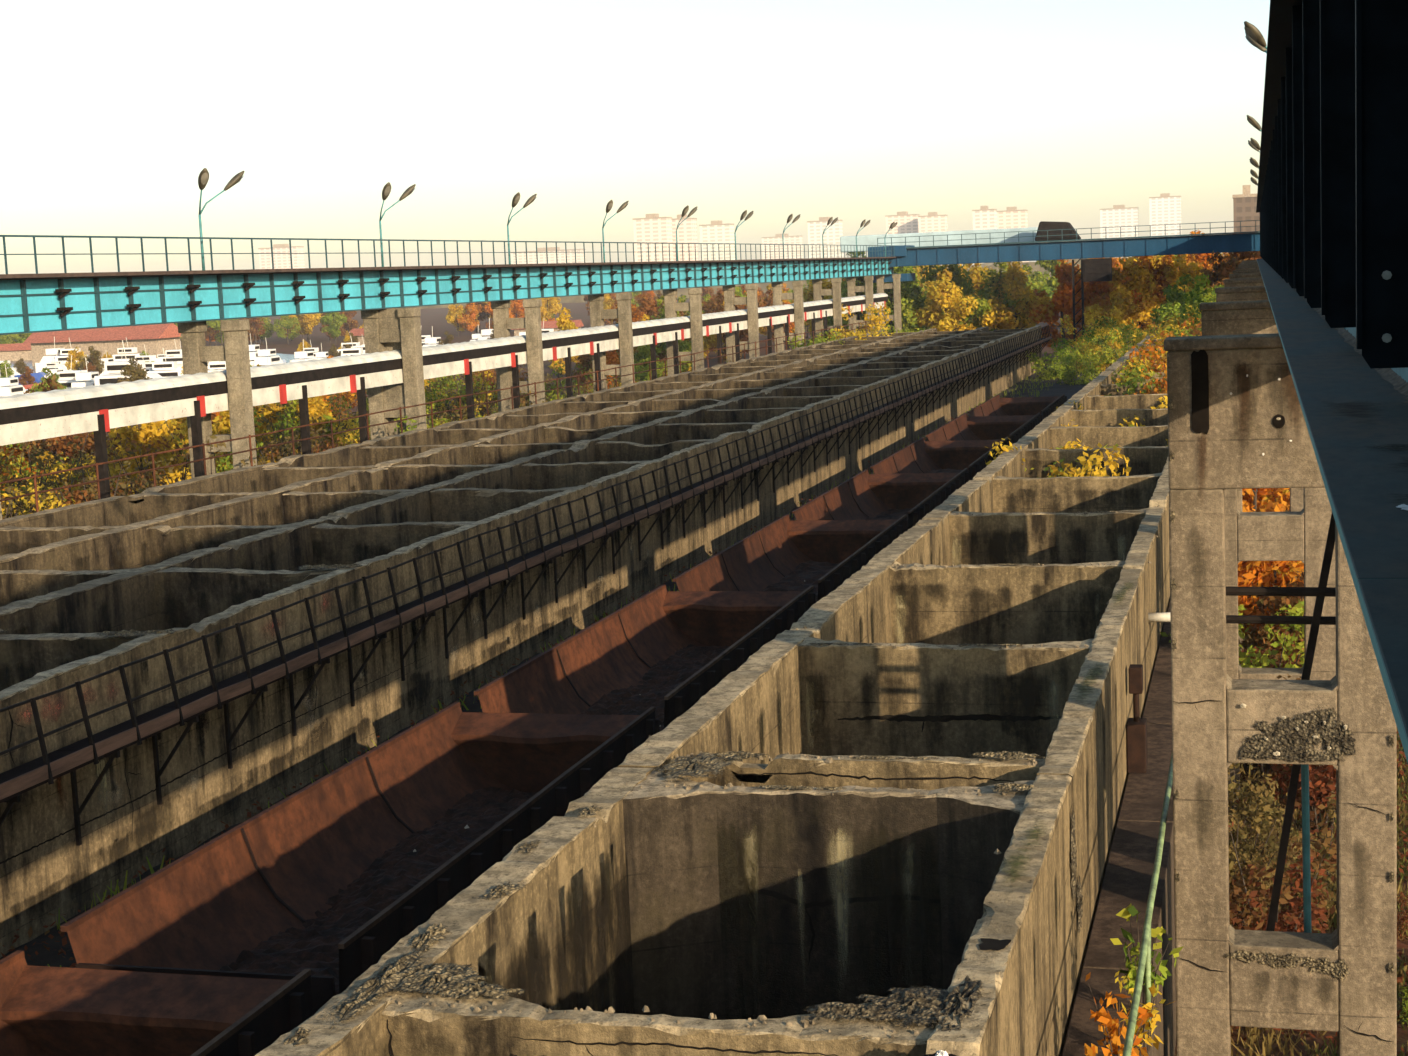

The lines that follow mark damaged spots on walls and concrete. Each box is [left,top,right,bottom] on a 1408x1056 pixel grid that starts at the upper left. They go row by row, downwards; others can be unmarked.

water stain [96,748,128,805]
spalling [653,751,948,795]
crack [838,714,1062,732]
spalling [970,751,1045,765]
spalling [1239,704,1356,763]
water stain [99,802,164,865]
water stain [12,875,75,919]
water stain [718,825,765,1019]
water stain [833,826,943,997]
spalling [324,923,531,1029]
spalling [548,1006,615,1014]
spalling [785,976,982,1039]